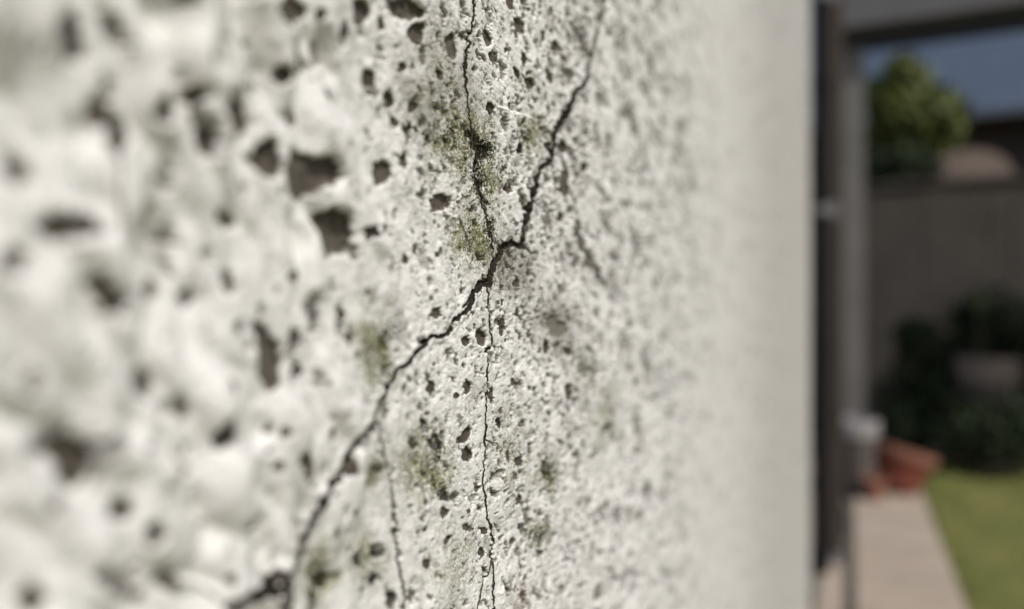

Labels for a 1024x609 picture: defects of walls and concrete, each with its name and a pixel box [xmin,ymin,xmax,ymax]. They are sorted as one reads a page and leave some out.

crack [288,0,607,609]